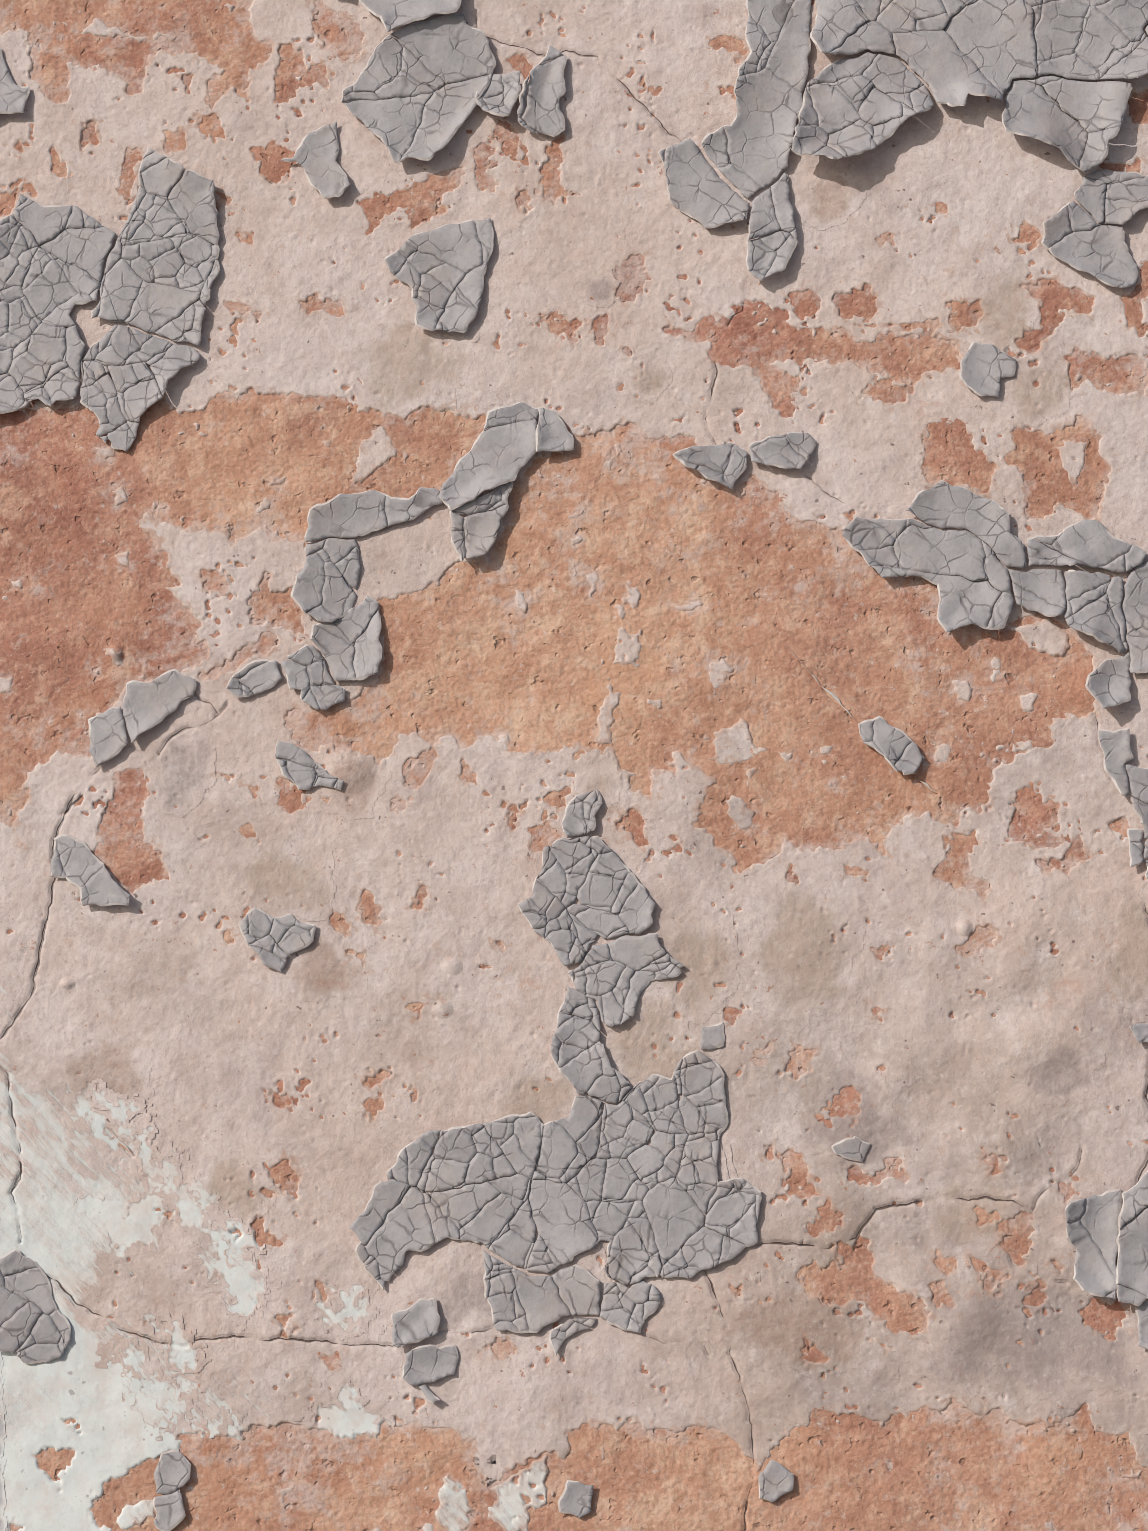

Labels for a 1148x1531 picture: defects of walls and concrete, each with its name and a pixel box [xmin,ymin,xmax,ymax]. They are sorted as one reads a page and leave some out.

flaking render [0,0,1148,914]
peeling [180,890,388,972]
spalling [263,1059,323,1119]
peeling [350,772,1061,1373]
spalling [232,1217,283,1270]
spalling [249,1159,299,1217]
crack [762,1201,919,1249]
crack [960,1196,1037,1210]
peeling [1050,1168,1148,1349]
peeling [0,1249,71,1364]
flaking render [90,1297,1148,1531]
flaking render [35,1448,75,1481]